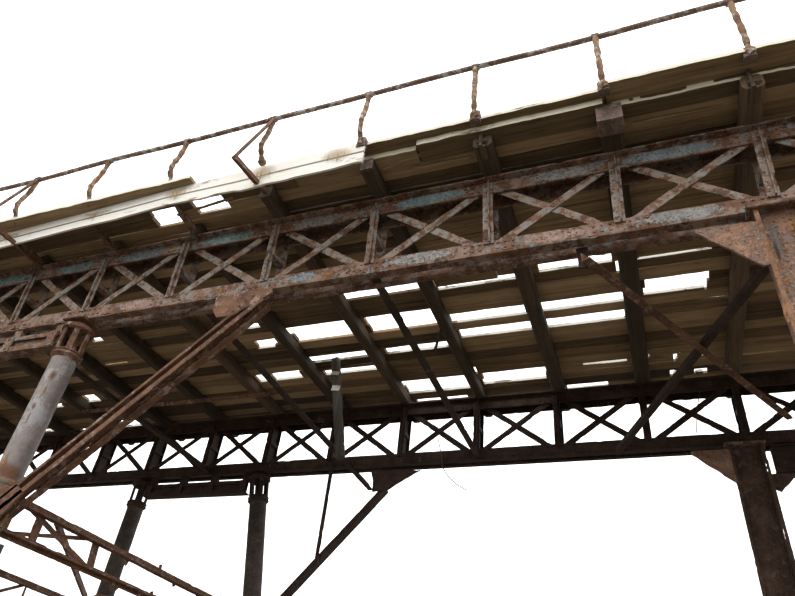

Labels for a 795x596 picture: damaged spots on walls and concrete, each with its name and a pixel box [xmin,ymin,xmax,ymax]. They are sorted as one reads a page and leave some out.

peeling [620,142,717,164]
peeling [530,164,598,182]
peeling [634,205,726,224]